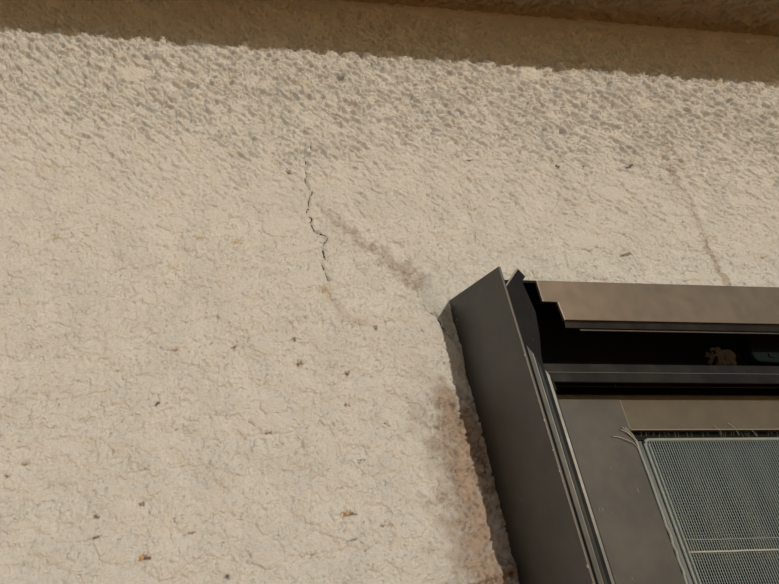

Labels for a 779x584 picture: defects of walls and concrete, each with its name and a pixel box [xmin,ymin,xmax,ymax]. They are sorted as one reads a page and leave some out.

crack [304,146,328,281]